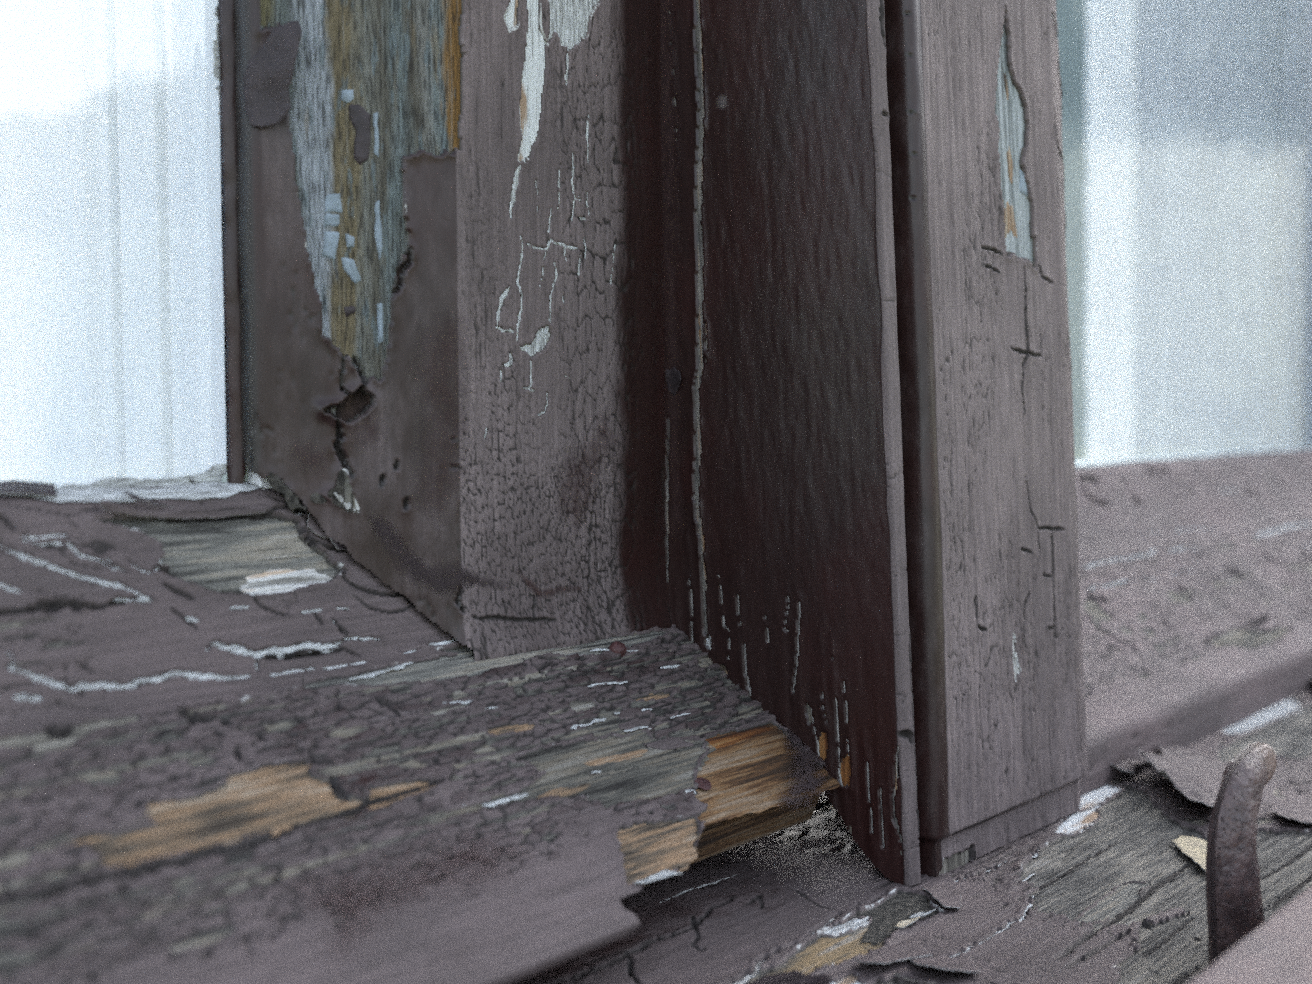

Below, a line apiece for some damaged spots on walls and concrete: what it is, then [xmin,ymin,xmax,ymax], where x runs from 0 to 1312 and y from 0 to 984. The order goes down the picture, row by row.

peeling [260,0,462,421]
peeling [505,0,599,161]
crack [496,115,616,416]
crack [562,53,570,86]
peeling [995,25,1033,263]
crack [0,534,413,702]
crack [175,514,265,522]
peeling [99,491,347,595]
crack [442,700,497,709]
peeling [65,762,436,867]
crack [482,793,528,807]
peeling [1021,698,1312,984]